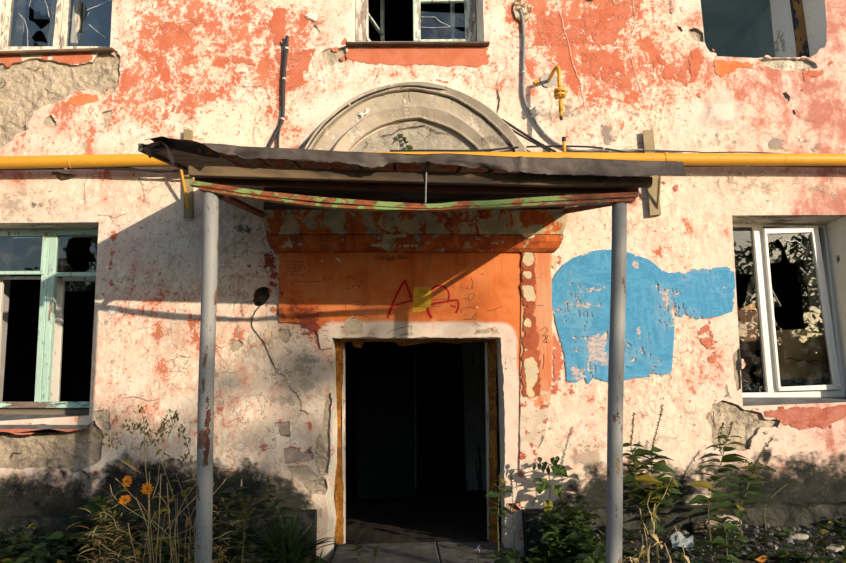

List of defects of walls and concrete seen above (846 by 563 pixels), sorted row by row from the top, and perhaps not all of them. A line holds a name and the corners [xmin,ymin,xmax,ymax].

spalling [0,51,120,148]
spalling [648,24,834,91]
crack [251,306,308,415]
spalling [0,400,120,473]
spalling [260,393,335,495]
spalling [706,400,846,451]